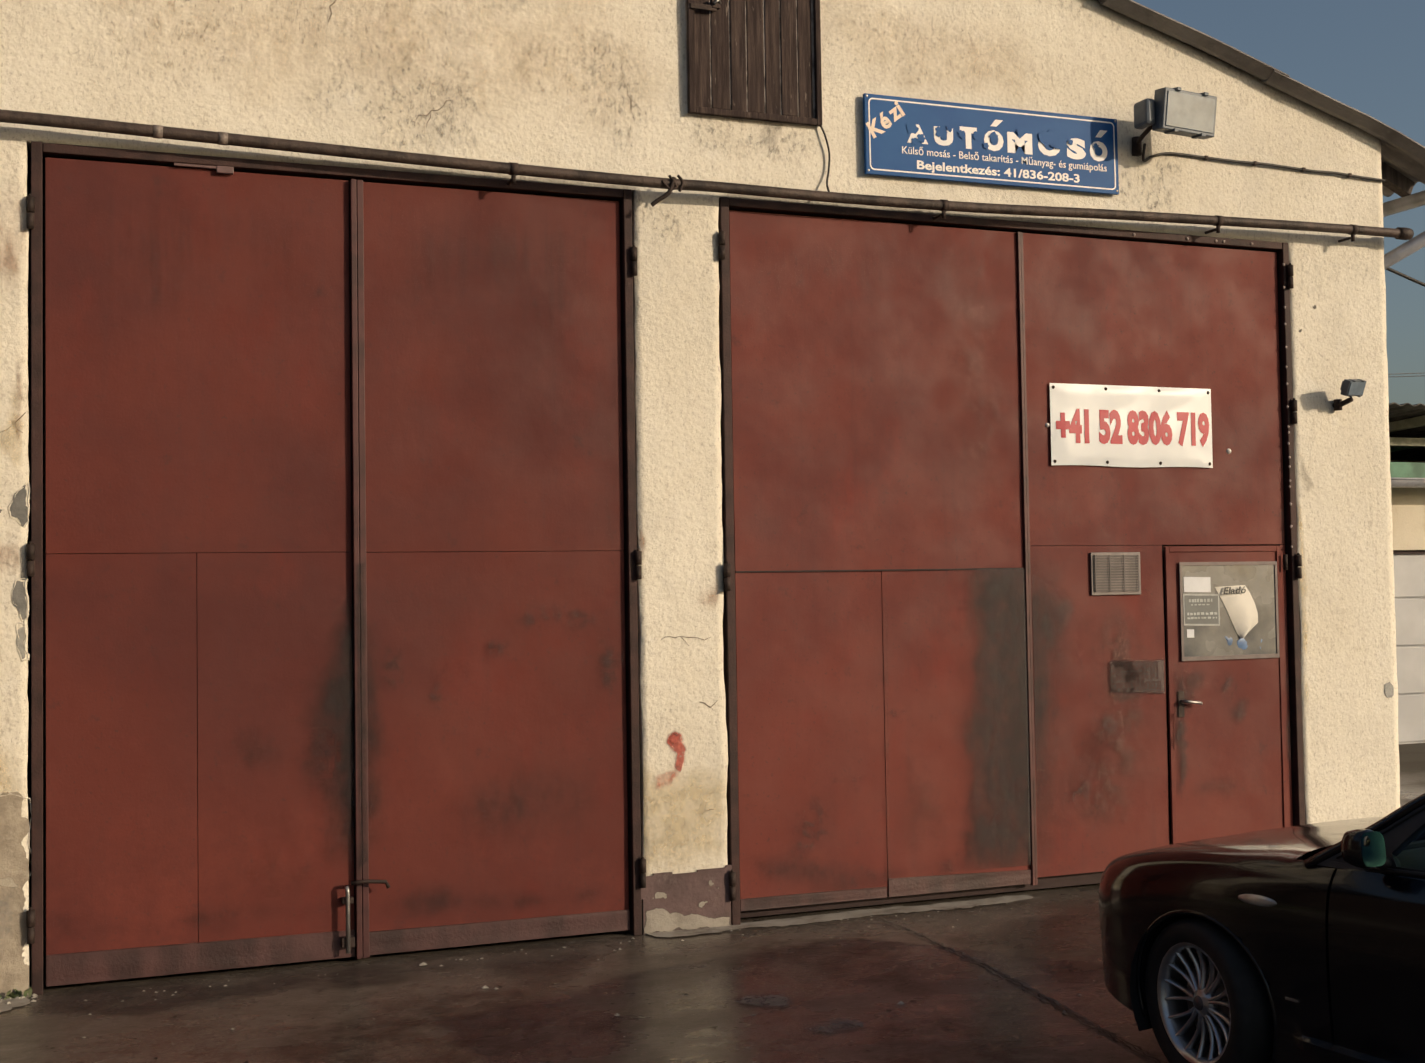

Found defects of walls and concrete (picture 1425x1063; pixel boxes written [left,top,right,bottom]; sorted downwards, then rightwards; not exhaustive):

flaking render [0,483,31,528]
flaking render [0,792,31,997]
flaking render [644,880,730,934]